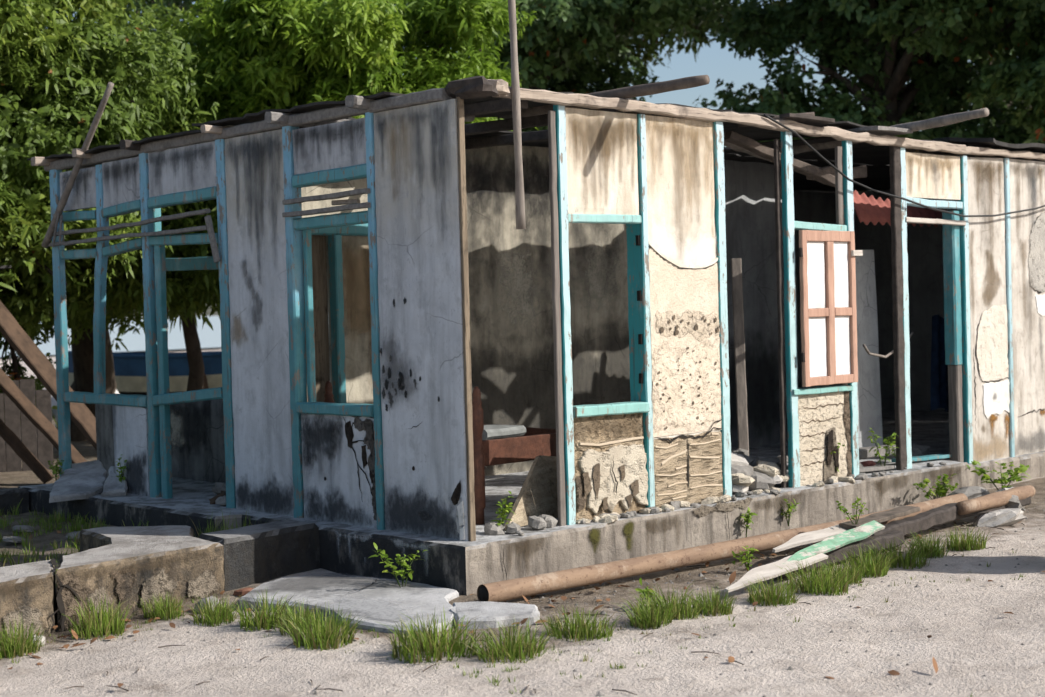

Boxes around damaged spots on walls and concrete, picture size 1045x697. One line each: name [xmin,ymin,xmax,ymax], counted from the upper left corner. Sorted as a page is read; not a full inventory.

water stain [466,159,550,319]
peeling [1028,213,1045,316]
peeling [576,241,722,515]
peeling [975,304,1010,419]
water stain [236,482,293,514]
water stain [302,415,342,464]
water stain [306,491,371,551]
crack [343,417,373,502]
water stain [384,491,460,563]
spalling [823,391,852,481]
crack [49,558,80,632]